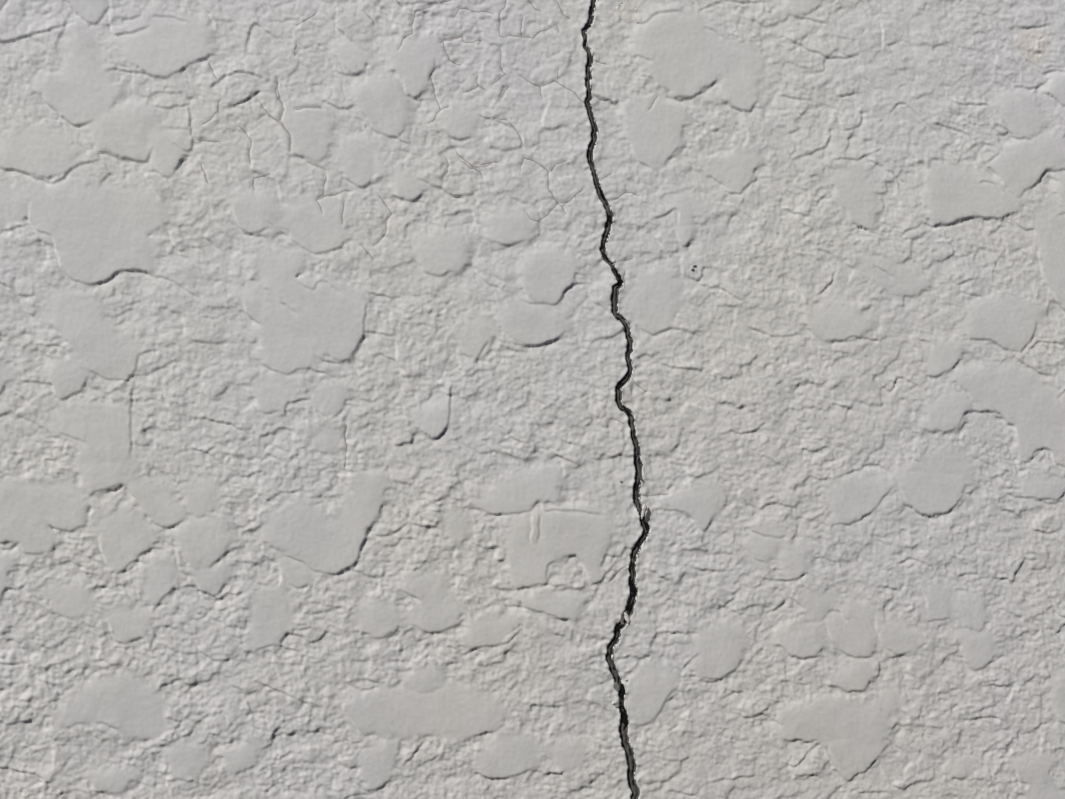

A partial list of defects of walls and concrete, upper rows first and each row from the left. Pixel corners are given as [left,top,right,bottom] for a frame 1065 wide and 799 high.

crack [341,427,349,467]
crack [396,0,667,799]